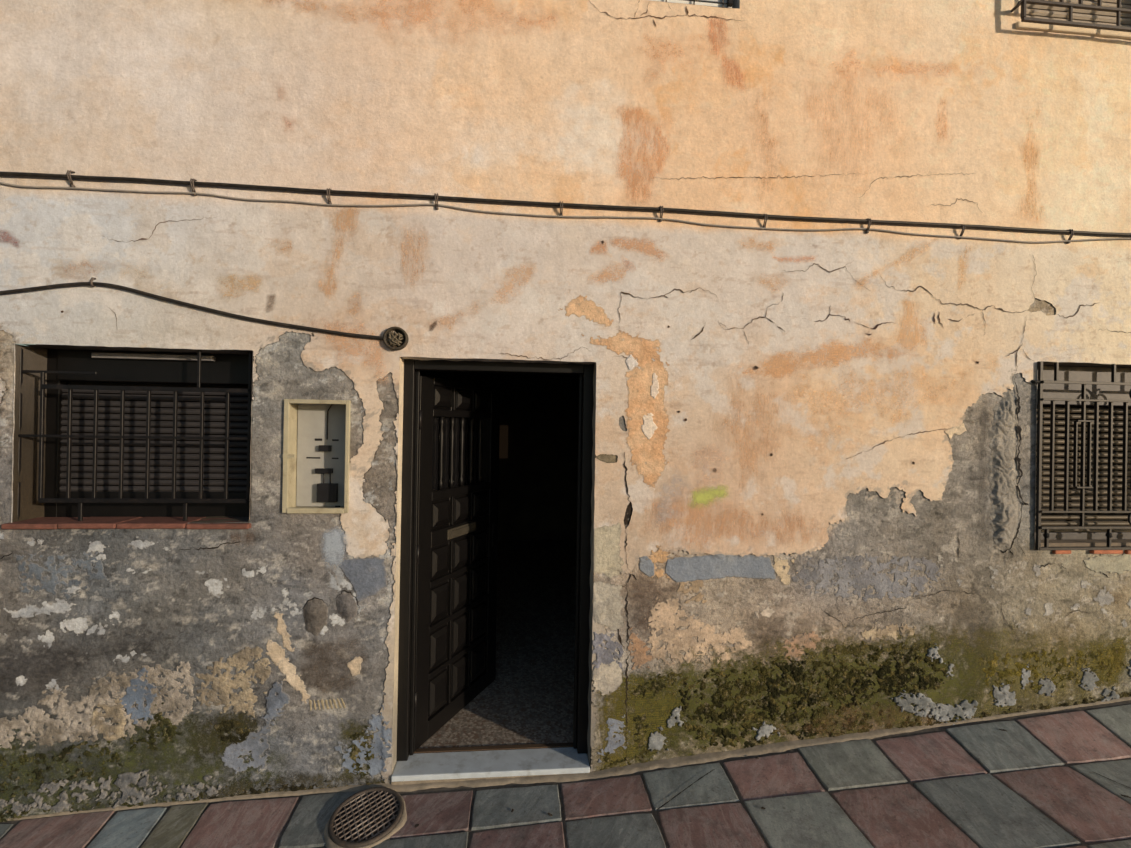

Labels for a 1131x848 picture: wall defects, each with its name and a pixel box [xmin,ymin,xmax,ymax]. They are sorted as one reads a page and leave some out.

crack [589,0,740,26]
crack [103,217,215,243]
flaking render [558,295,670,488]
crack [655,173,978,206]
crack [618,256,1066,569]
crack [1058,303,1131,333]
flaking render [0,330,399,819]
crack [618,531,637,757]
flaking render [591,373,1131,772]
leakage [0,769,222,816]